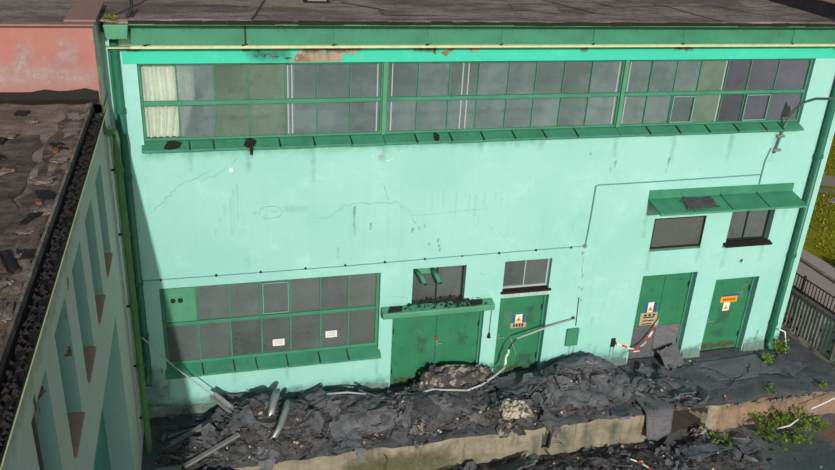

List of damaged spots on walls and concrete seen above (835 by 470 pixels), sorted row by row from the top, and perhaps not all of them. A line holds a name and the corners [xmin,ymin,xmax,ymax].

peeling [289,48,364,62]
crack [702,362,798,388]